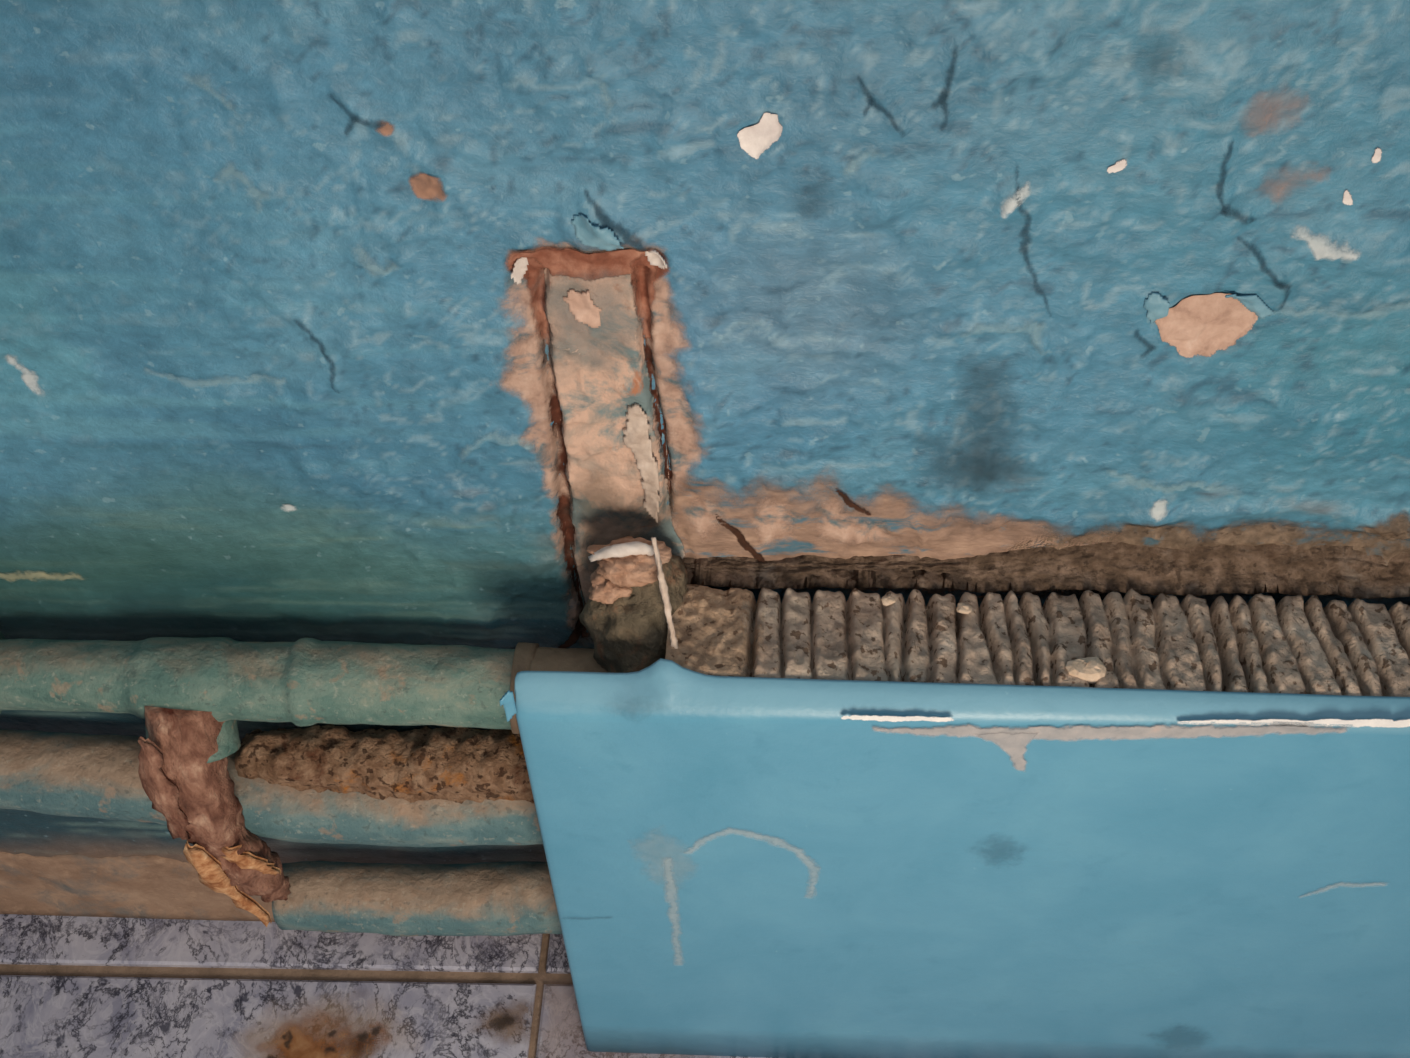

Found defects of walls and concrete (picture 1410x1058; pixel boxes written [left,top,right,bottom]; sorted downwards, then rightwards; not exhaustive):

spalling [737,113,783,159]
crack [862,85,897,129]
crack [934,61,954,130]
peeling [410,174,446,200]
crack [1017,190,1029,262]
crack [1218,148,1290,308]
rust [506,248,669,349]
peeling [503,214,1410,629]
peeling [841,715,1410,771]
rust [138,737,281,927]
rust [268,1018,385,1058]